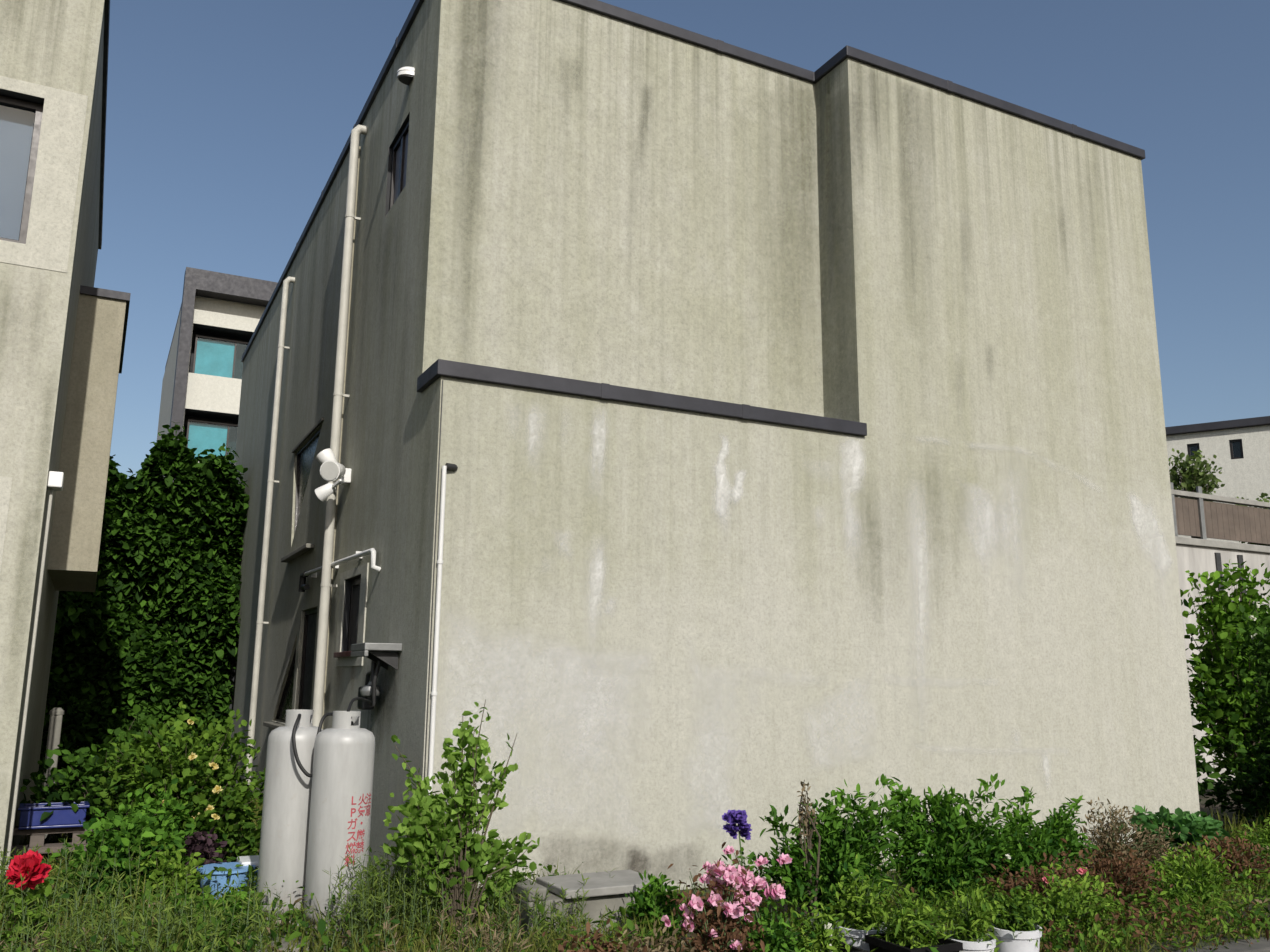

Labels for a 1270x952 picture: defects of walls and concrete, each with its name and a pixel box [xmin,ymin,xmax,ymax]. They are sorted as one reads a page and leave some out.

water stain [593,420,605,466]